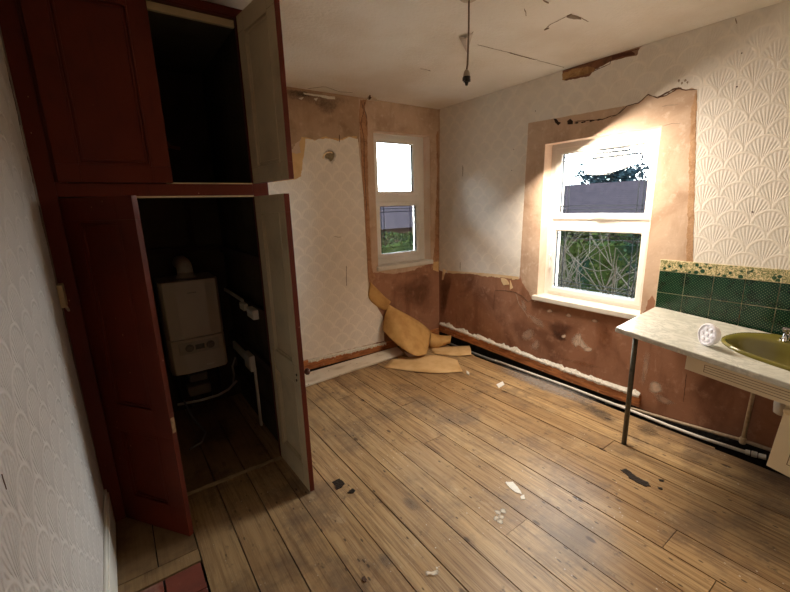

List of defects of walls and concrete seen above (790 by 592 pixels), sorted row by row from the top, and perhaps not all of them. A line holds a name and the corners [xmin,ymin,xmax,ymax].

flaking render [562,48,640,81]
flaking render [359,95,377,284]
flaking render [431,132,446,280]
flaking render [686,91,697,262]
flaking render [439,322,640,398]
leakage [553,313,591,351]